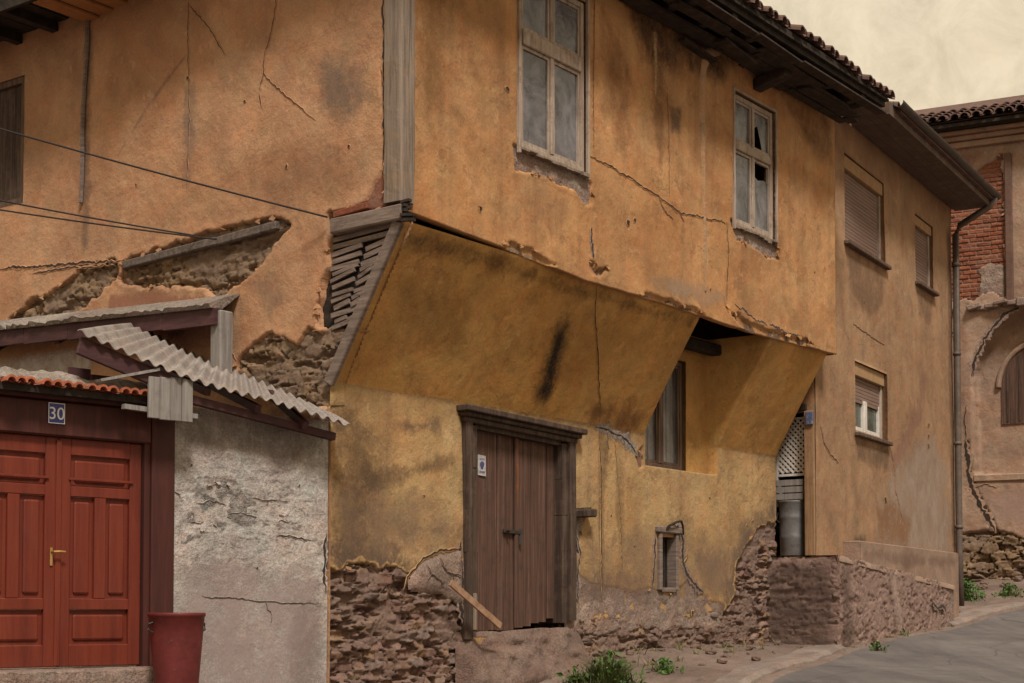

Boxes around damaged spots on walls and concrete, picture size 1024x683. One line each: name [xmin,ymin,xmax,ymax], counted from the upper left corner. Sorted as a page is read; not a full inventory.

crack [186,5,226,188]
crack [259,0,316,120]
flaking render [513,145,595,205]
crack [590,0,798,336]
spalling [726,304,814,346]
crack [593,285,638,602]
crack [962,405,998,534]
crack [203,533,328,624]
crack [652,523,704,595]